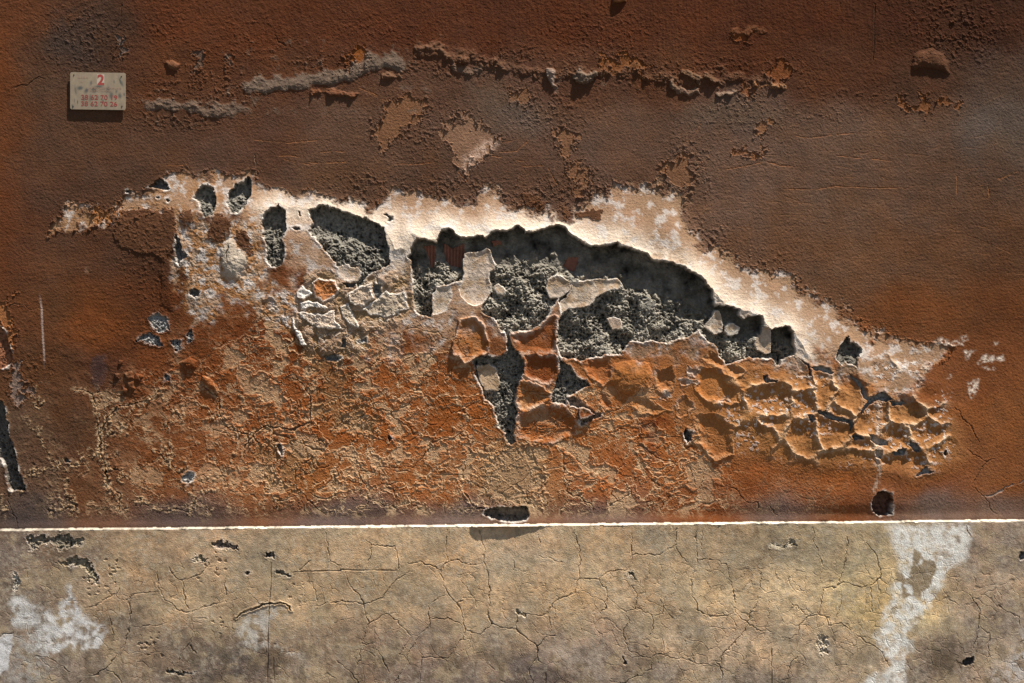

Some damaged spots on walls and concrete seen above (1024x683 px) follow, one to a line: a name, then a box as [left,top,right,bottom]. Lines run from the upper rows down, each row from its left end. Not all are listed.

peeling [91,152,948,444]
spalling [0,302,36,492]
spalling [473,325,545,523]
damp [934,336,1005,395]
spalling [26,533,100,585]
crack [46,590,151,683]
crack [157,562,210,663]
crack [235,375,724,683]
crack [788,535,890,667]
spalling [871,491,894,517]
damp [863,520,1024,683]
crack [970,595,1021,658]